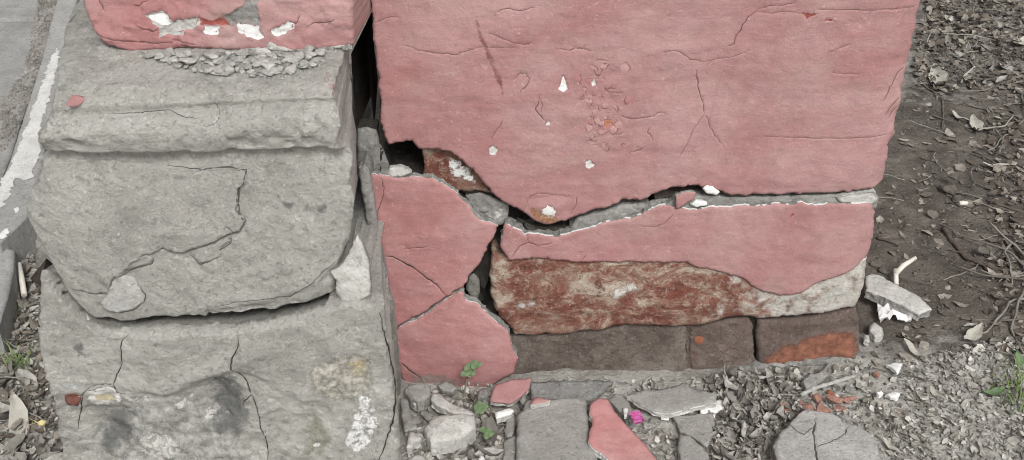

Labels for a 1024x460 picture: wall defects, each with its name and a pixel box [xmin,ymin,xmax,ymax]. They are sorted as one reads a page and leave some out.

peeling [145,0,352,52]
crack [407,7,533,55]
crack [517,73,544,120]
crack [665,0,914,157]
crack [642,187,703,228]
crack [385,247,445,295]
crack [476,193,577,305]
crack [77,335,128,430]
crack [230,342,268,460]